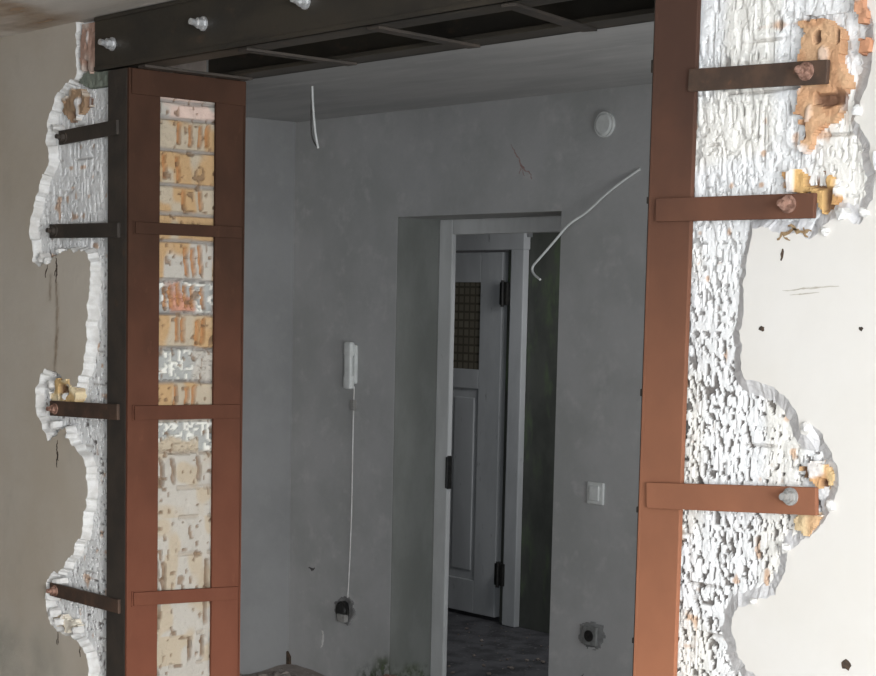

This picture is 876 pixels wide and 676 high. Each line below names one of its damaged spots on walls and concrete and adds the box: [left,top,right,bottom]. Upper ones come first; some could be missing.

spalling [38,21,110,676]
spalling [677,220,835,676]
spalling [694,0,876,241]